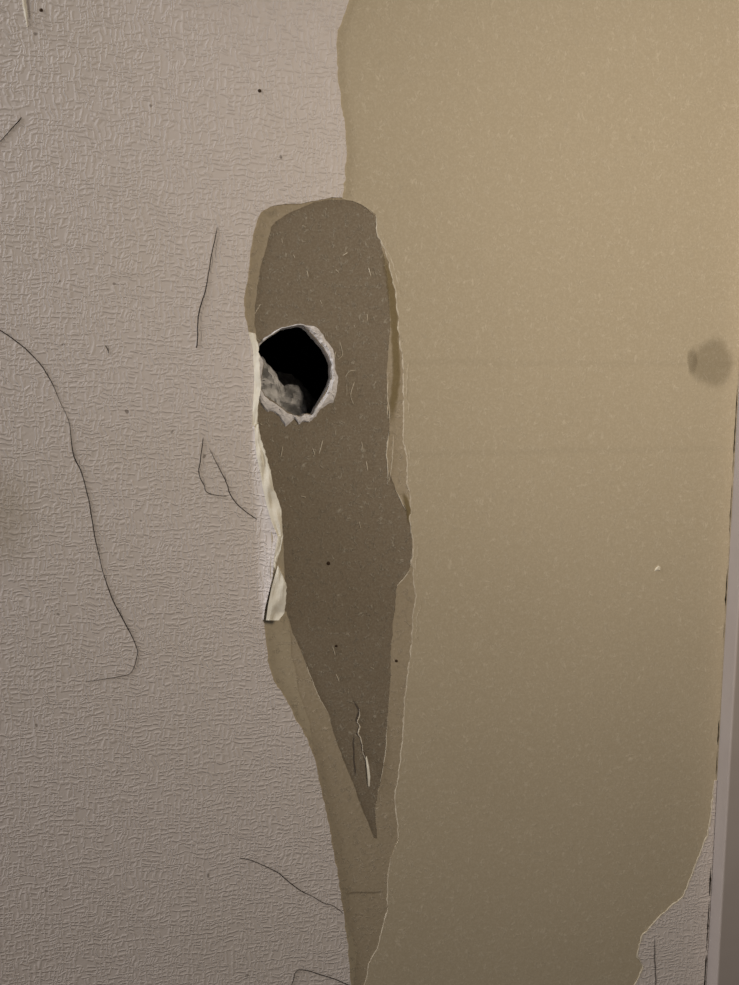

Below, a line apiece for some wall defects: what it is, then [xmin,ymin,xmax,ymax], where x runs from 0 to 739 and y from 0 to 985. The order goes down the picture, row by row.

peeling [248,332,338,620]
peeling [336,0,739,985]